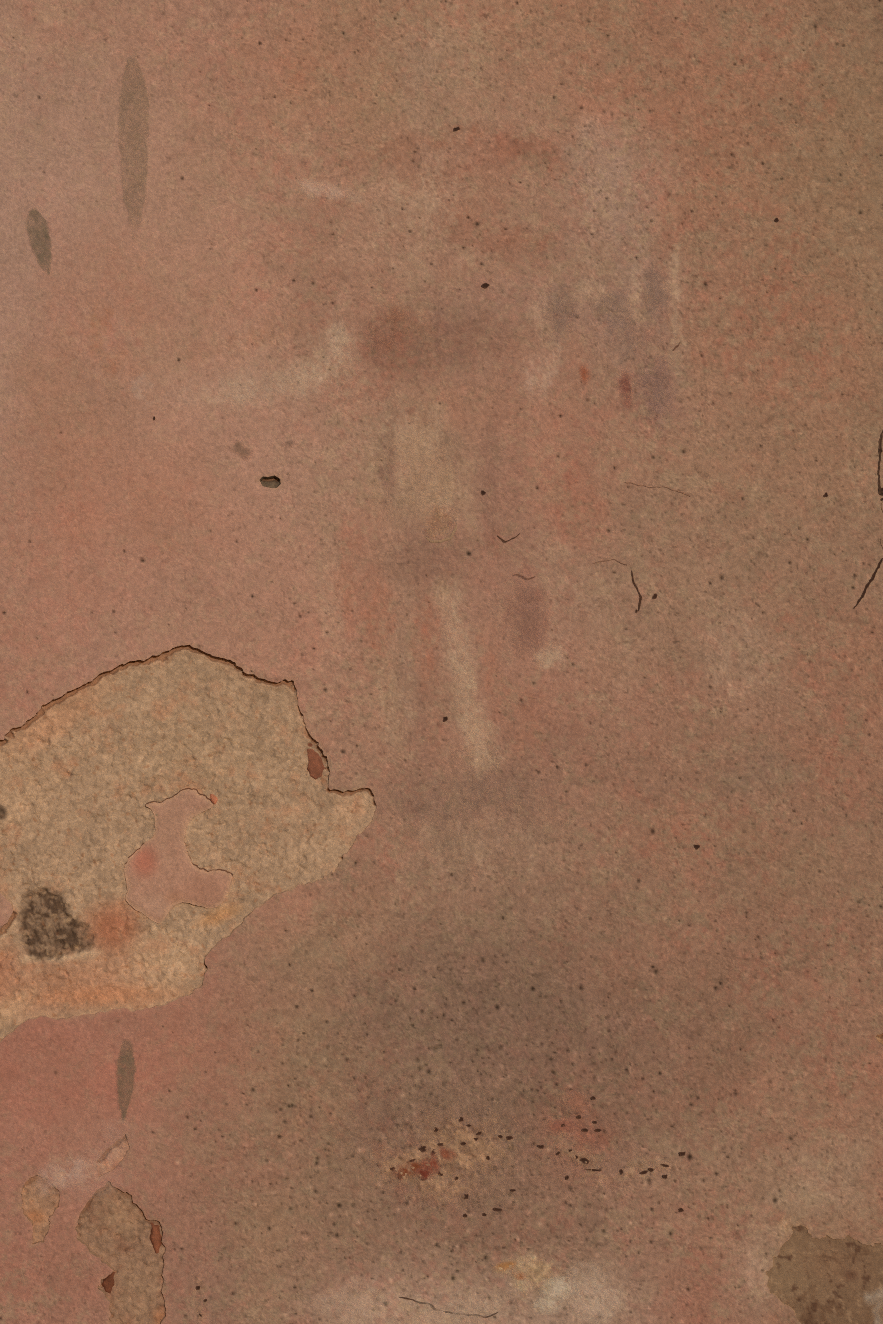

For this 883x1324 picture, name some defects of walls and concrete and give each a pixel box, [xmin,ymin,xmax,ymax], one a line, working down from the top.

crack [854,431,883,608]
flaking render [0,645,377,1042]
flaking render [75,1134,166,1324]
flaking render [766,1225,883,1324]